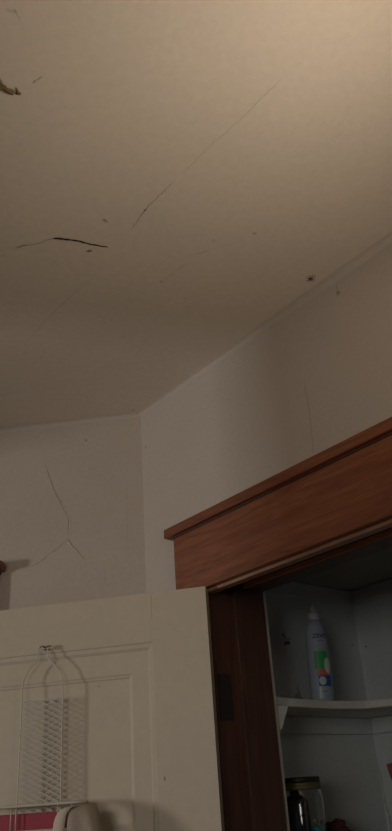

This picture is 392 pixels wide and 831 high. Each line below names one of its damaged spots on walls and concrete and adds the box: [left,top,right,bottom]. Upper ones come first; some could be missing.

crack [54,238,107,247]